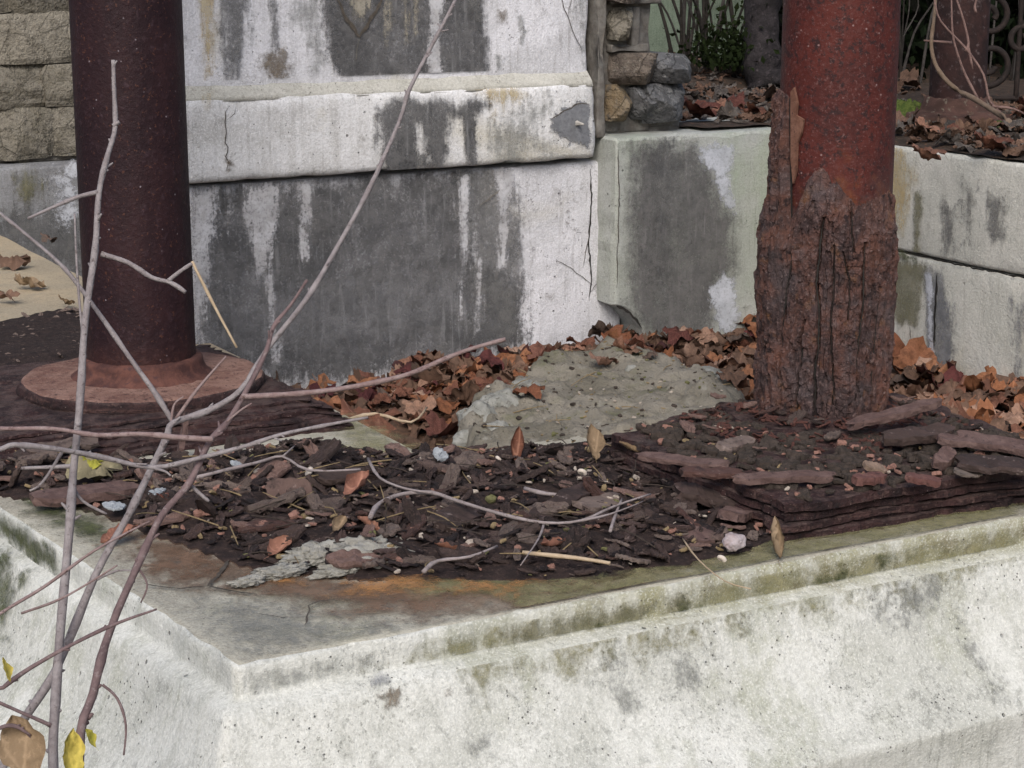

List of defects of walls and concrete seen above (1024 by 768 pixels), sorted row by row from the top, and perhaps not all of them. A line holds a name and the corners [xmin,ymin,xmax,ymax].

damp [219,0,254,79]
damp [259,0,290,78]
damp [309,0,490,76]
crack [225,108,236,171]
spalling [548,100,592,148]
damp [191,88,533,385]
crack [558,150,620,296]
damp [627,141,741,336]
damp [912,193,922,252]
damp [941,199,953,255]
damp [986,191,1006,241]
damp [924,267,954,365]